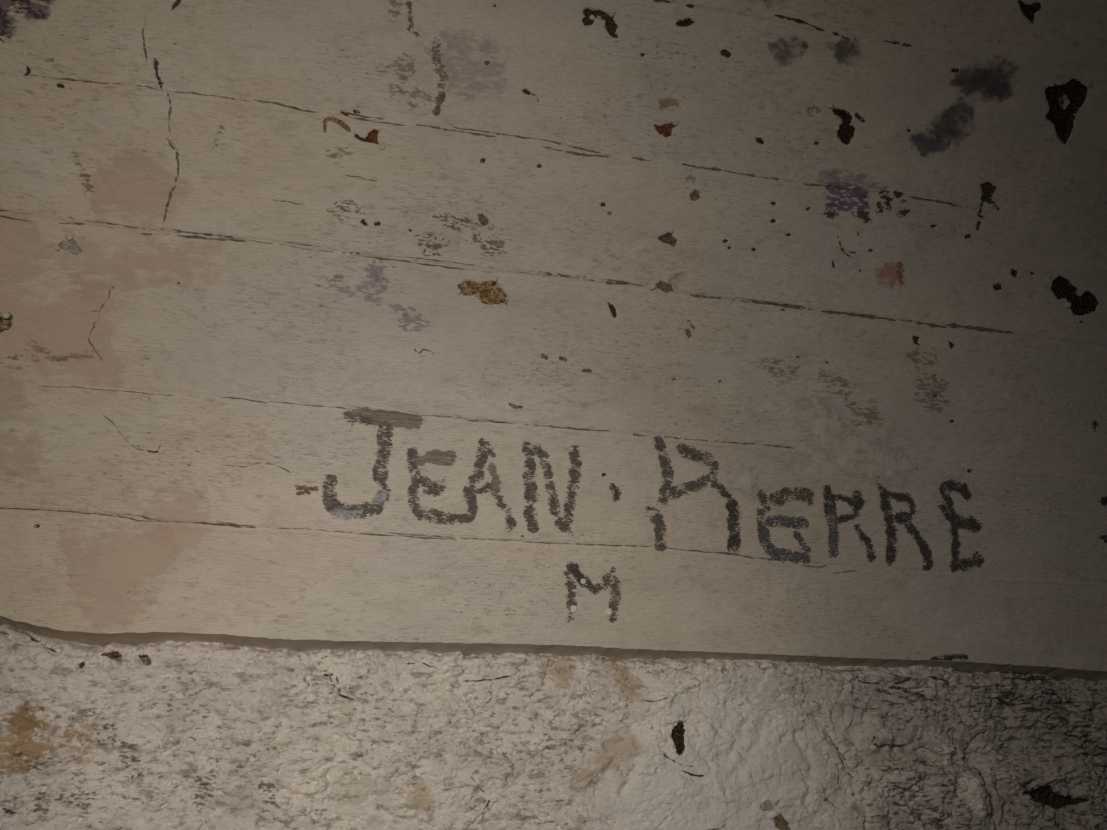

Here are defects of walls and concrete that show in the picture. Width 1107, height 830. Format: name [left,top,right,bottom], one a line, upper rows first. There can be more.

leakage [0,0,52,42]
spalling [582,8,618,38]
crack [654,0,694,8]
crack [774,15,849,39]
spalling [828,102,865,144]
spalling [1045,79,1092,144]
crack [30,20,651,286]
crack [682,163,855,190]
spalling [455,275,509,305]
crack [690,294,1014,333]
spalling [1051,276,1099,323]
spalling [671,718,685,755]